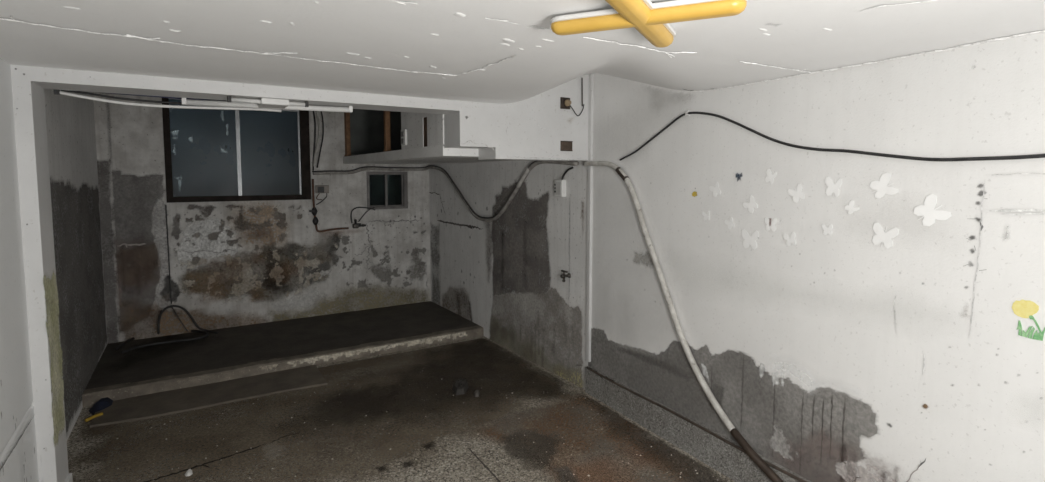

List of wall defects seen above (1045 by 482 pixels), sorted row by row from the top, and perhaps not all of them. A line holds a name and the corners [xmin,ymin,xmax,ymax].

peeling [43,161,467,443]
peeling [490,182,882,482]